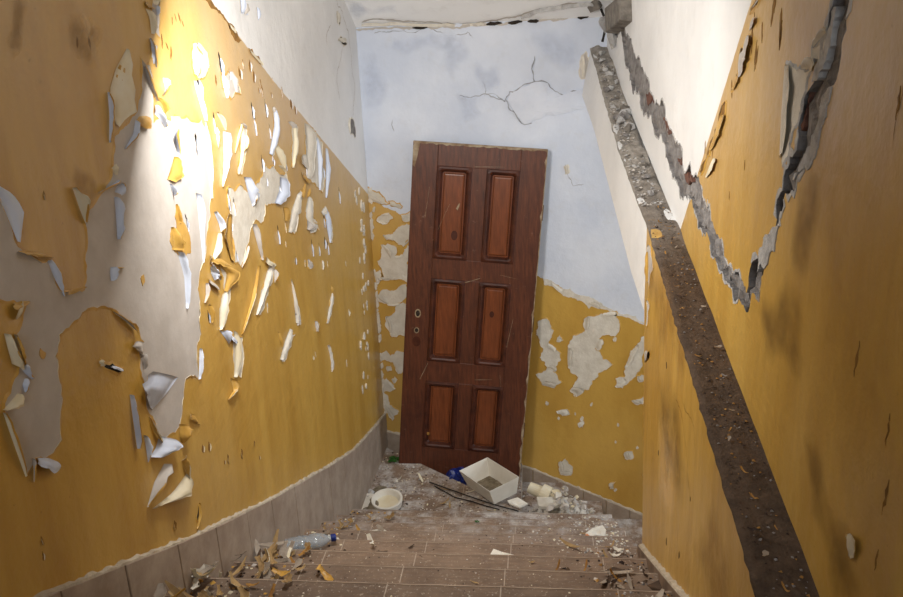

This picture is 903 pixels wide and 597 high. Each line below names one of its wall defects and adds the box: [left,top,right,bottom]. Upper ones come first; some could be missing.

spalling [348,116,356,138]
crack [326,2,611,106]
crack [616,0,852,305]
peeling [699,0,783,177]
peeling [0,0,341,529]
peeling [354,187,410,421]
peeling [535,243,654,398]
peeling [545,401,584,429]